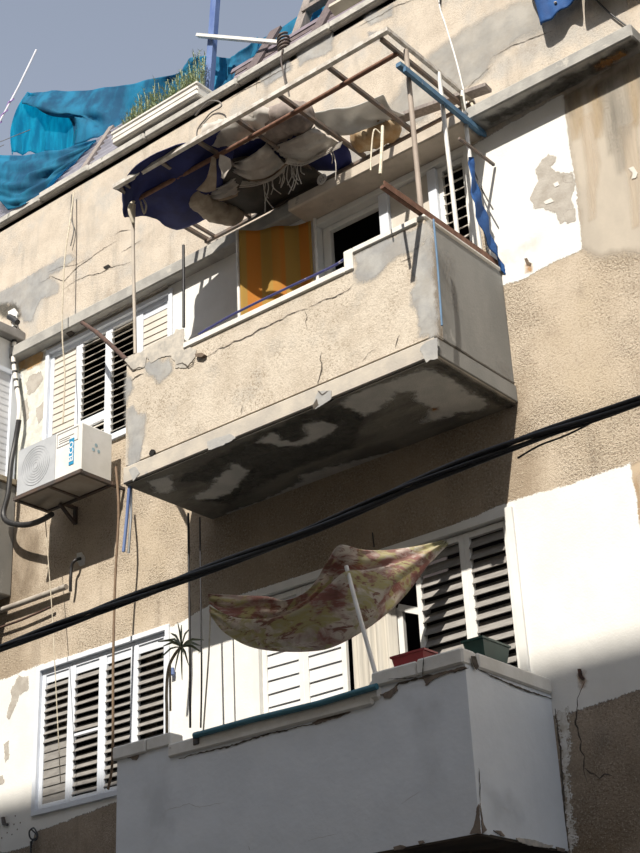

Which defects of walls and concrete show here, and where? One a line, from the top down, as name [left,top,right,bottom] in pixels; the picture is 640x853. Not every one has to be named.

peeling [530,154,576,224]
flaking render [123,329,207,381]
damp [437,365,516,407]
damp [177,406,362,504]
peeling [7,676,29,719]
crack [380,656,552,699]
crack [179,711,350,759]
crack [574,669,612,781]
peeling [516,707,579,853]
flaking render [469,803,505,837]